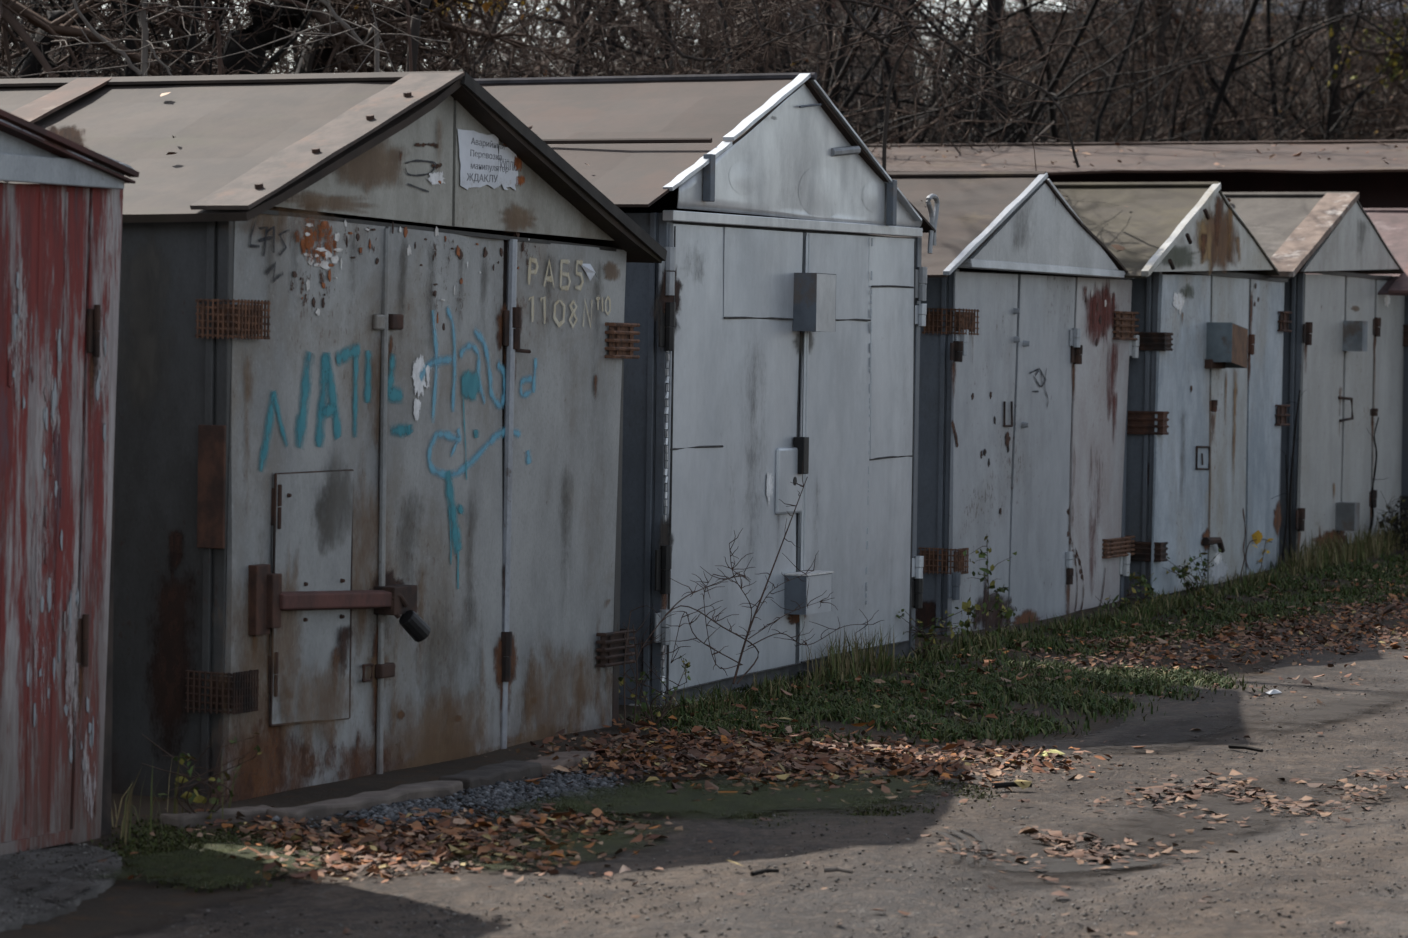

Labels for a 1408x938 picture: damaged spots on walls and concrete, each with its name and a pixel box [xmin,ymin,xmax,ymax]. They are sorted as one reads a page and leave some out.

peeling [287,216,536,330]
corrosion [1198,197,1240,272]
peeling [95,314,109,442]
corrosion [1107,343,1118,434]
peeling [7,246,98,819]
corrosion [373,571,404,590]
corrosion [333,626,477,779]
corrosion [494,635,518,710]